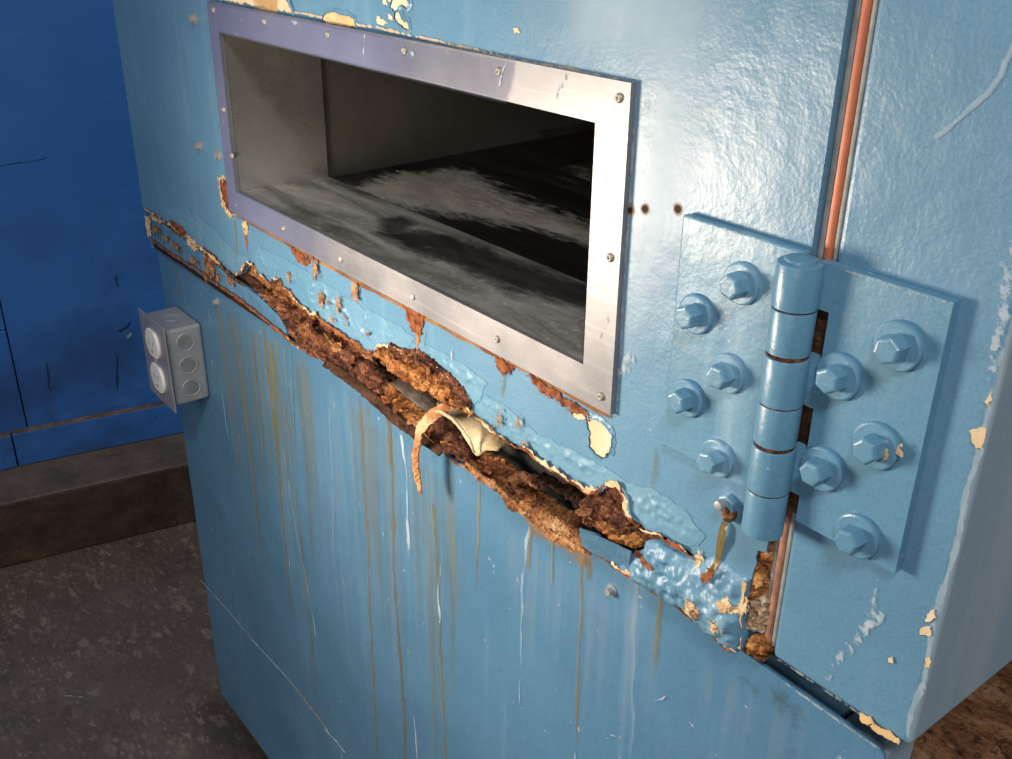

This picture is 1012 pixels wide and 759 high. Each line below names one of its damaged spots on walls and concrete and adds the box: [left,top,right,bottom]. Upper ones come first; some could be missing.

peeling [217,0,295,17]
peeling [321,8,358,29]
peeling [377,0,413,34]
rust [142,175,696,675]
peeling [572,412,616,460]
damp [521,525,532,607]
rust [700,522,728,584]
rust [711,541,775,662]
peeling [919,609,936,636]